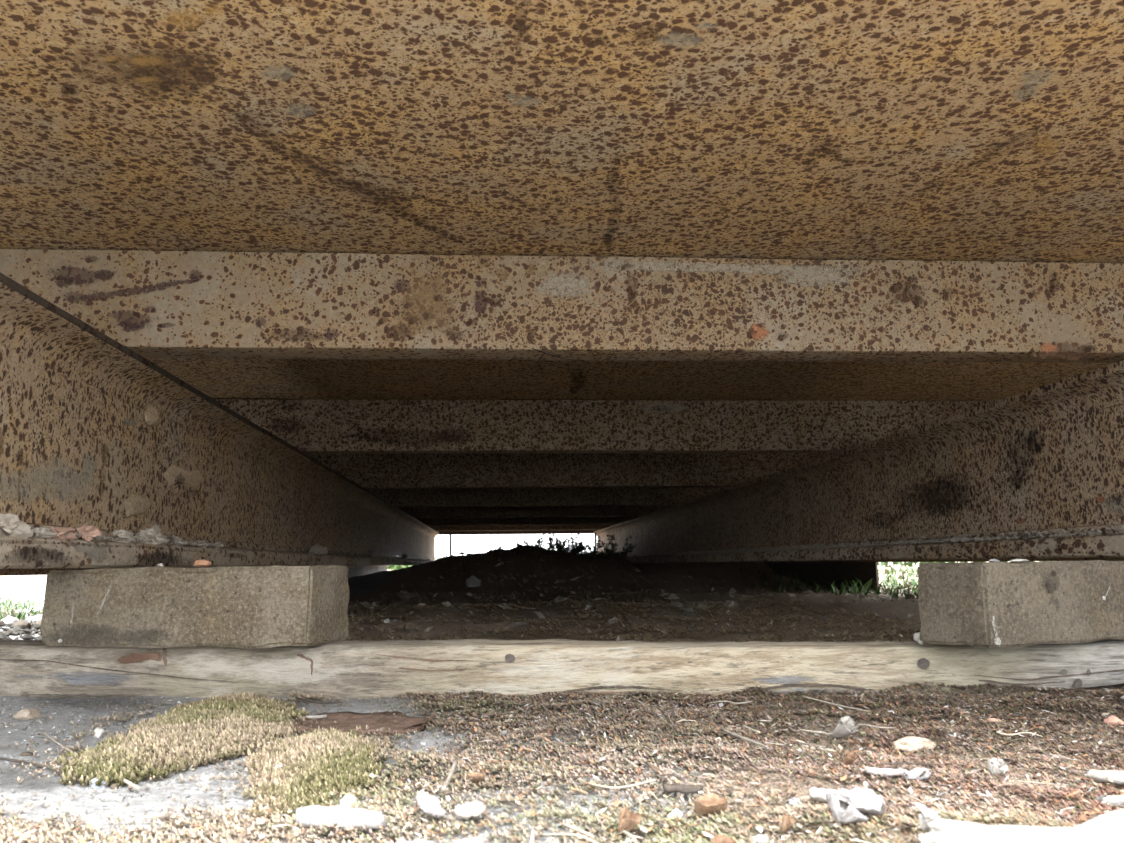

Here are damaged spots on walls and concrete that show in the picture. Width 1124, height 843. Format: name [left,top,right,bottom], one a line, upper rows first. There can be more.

rust [50,257,105,289]
rust [747,323,783,341]